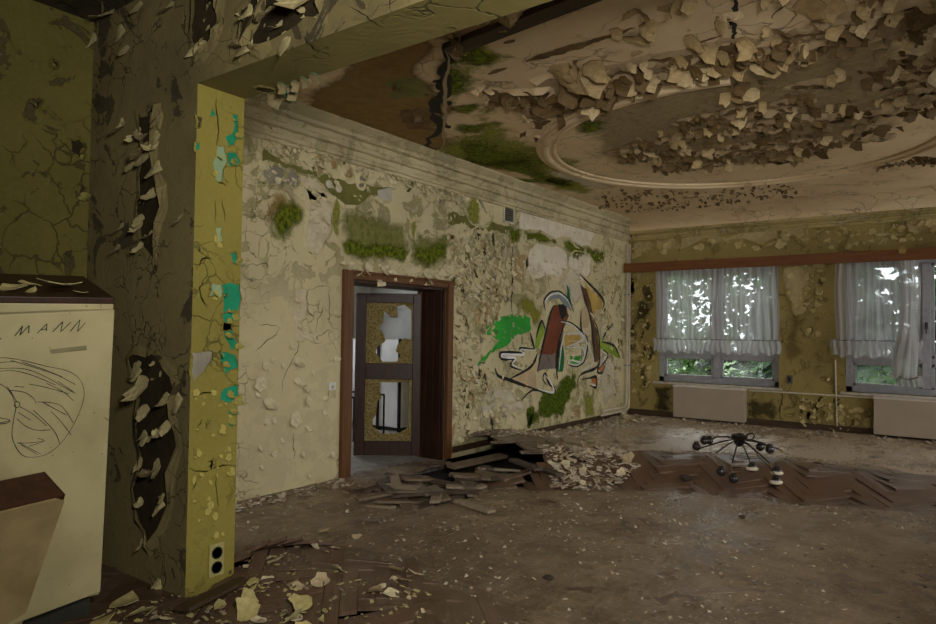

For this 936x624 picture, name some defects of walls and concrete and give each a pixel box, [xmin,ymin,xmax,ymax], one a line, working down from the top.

crack [587,27,635,42]
crack [700,0,739,44]
peeling [252,73,321,110]
peeling [468,0,936,176]
peeling [212,113,244,183]
peeling [214,226,243,266]
peeling [254,139,936,445]
peeling [120,281,245,557]
damp [640,367,669,410]
mould [748,400,777,419]